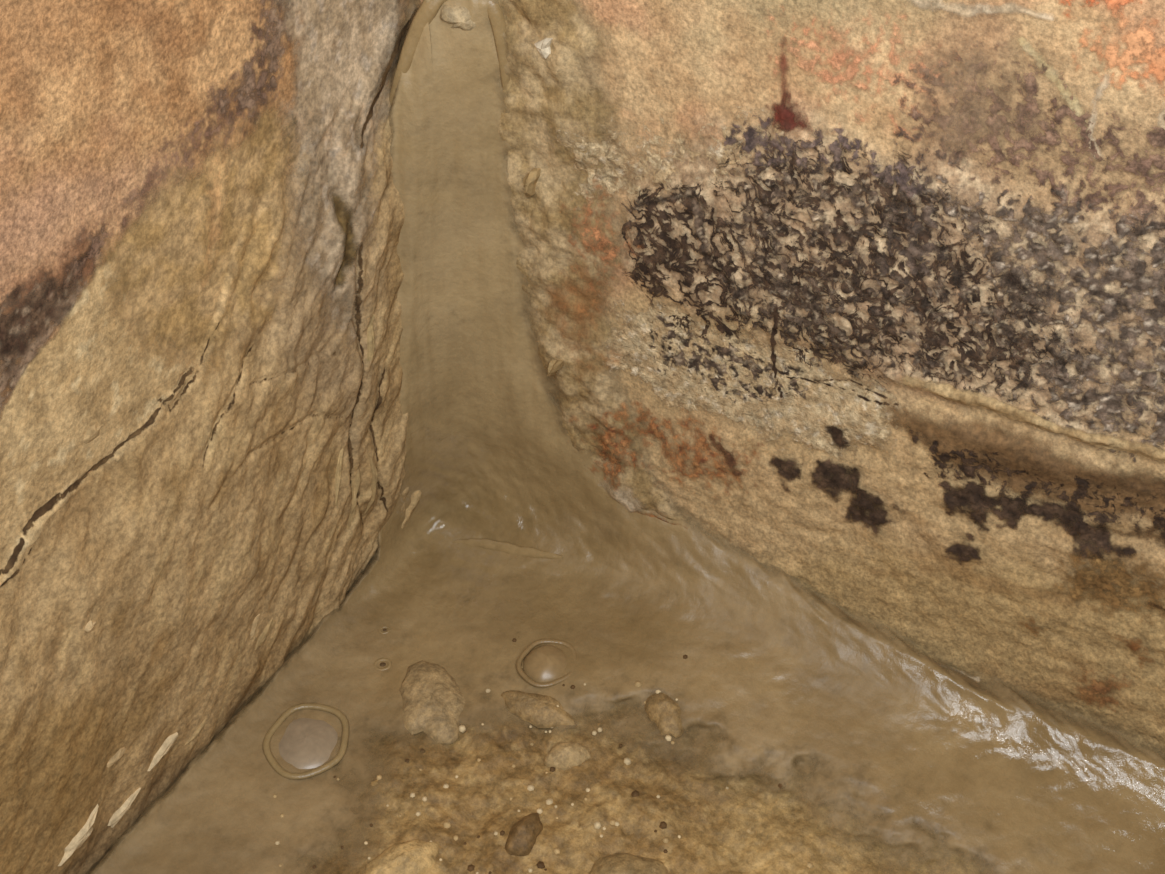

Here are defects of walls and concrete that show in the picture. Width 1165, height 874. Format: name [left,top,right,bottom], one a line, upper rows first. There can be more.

rust [773,38,807,131]
leakage [557,37,1165,565]
crack [0,323,219,587]